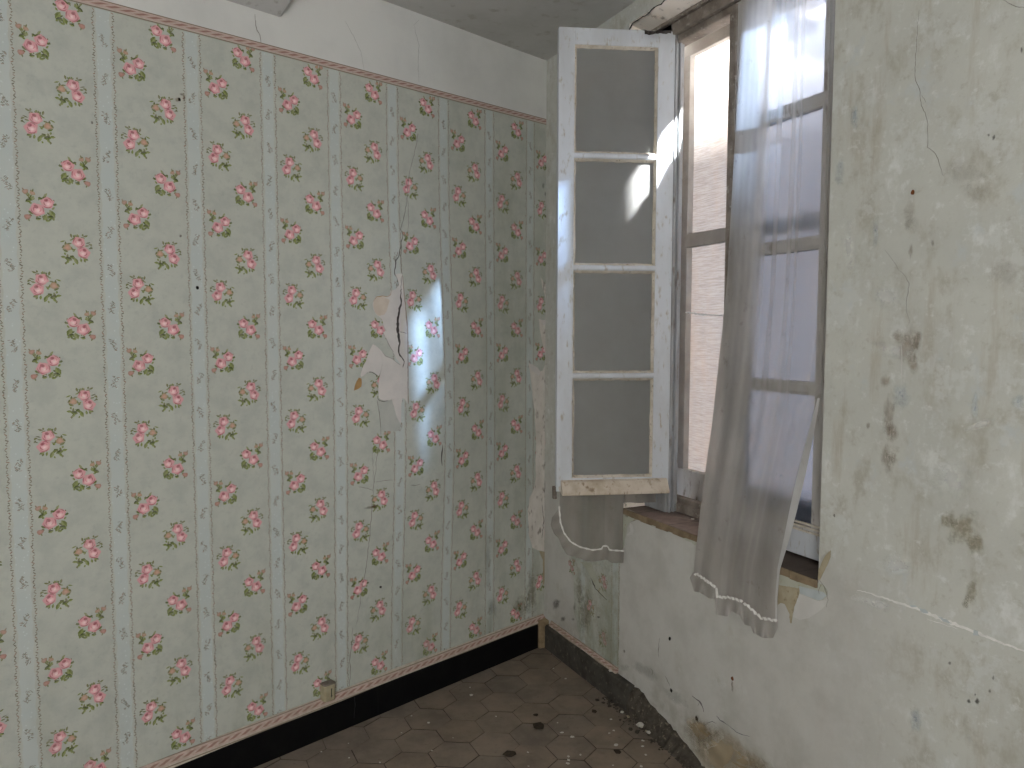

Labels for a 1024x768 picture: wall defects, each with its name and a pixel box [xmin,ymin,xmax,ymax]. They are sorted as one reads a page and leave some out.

crack [915,17,943,175]
crack [394,135,418,366]